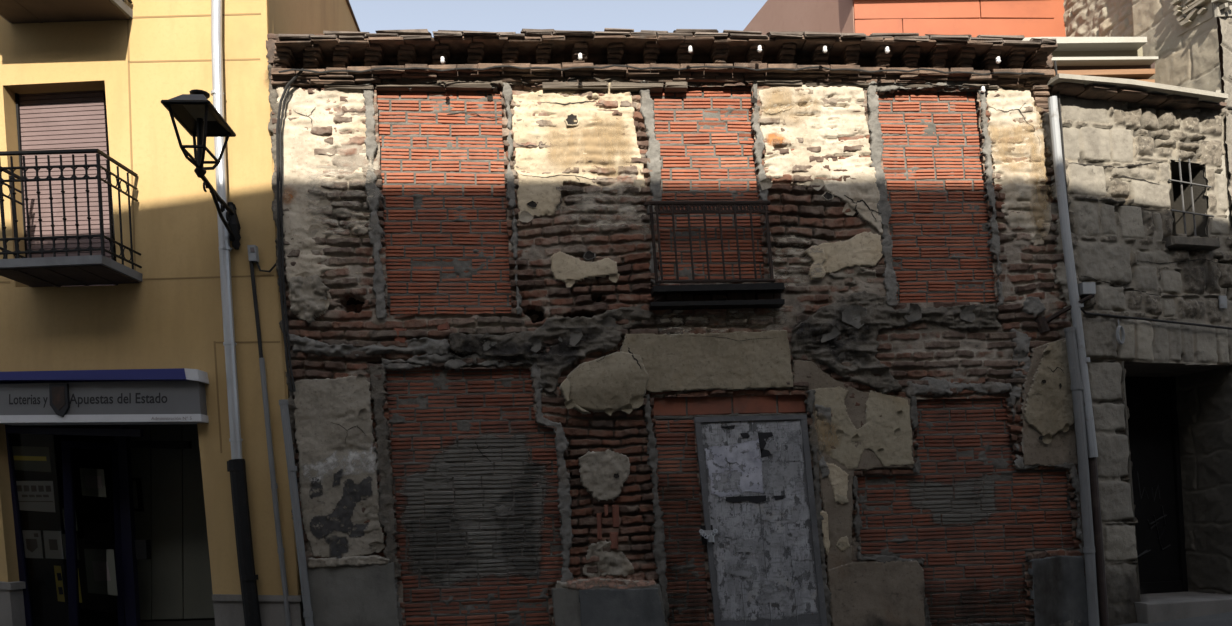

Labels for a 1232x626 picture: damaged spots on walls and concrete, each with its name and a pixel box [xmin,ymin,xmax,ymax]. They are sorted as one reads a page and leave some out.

flaking render [276,80,1077,626]